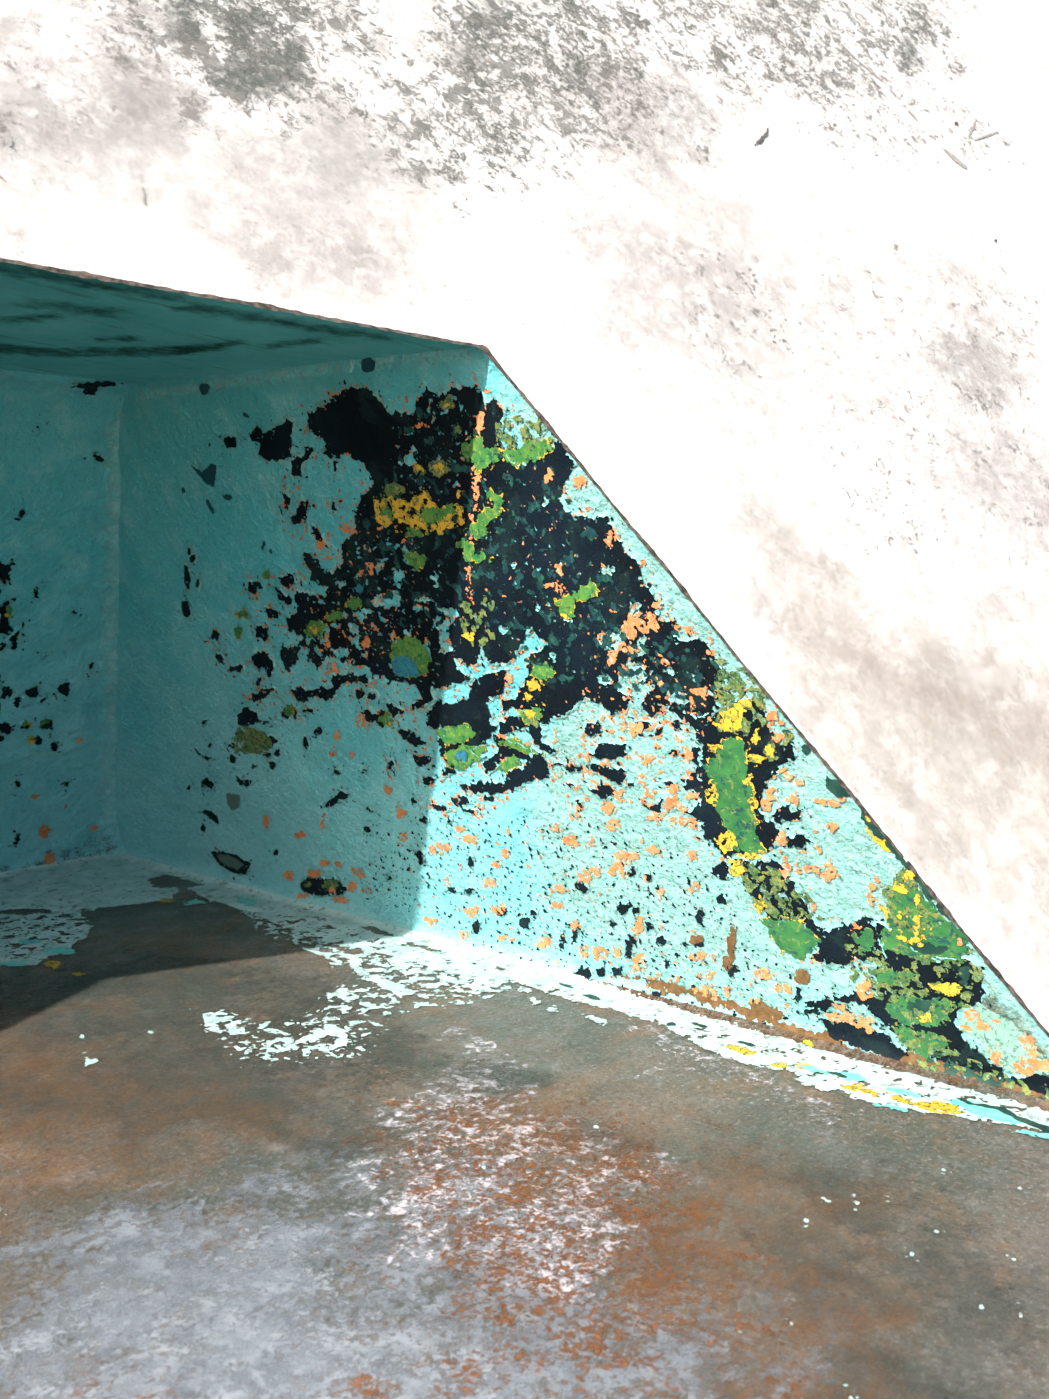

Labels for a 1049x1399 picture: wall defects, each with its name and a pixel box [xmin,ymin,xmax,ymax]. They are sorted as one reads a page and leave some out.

peeling [0,258,1049,1131]
rust [328,1088,897,1399]